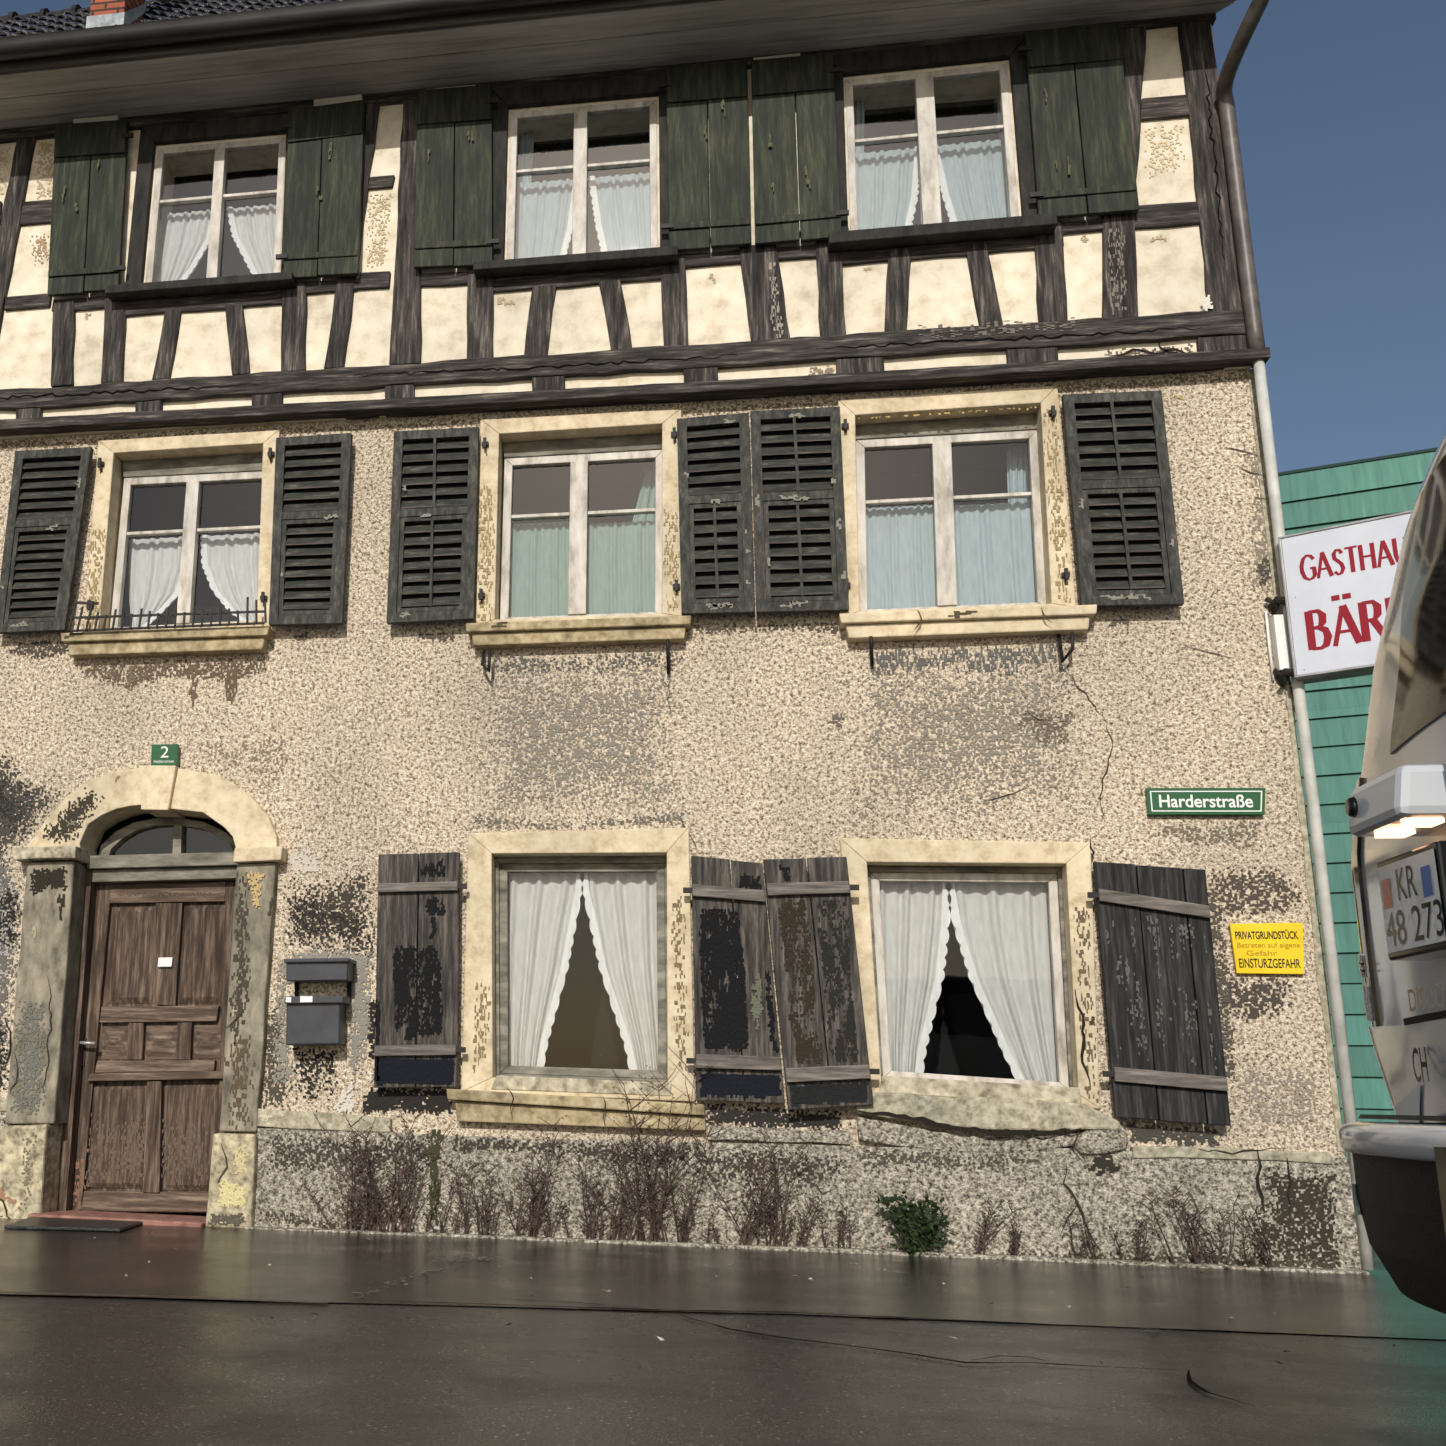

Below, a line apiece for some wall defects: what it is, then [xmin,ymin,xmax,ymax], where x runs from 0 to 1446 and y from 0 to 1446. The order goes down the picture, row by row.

water stain [9,529,269,707]
water stain [0,1024,10,1089]
water stain [0,750,105,948]
water stain [224,872,338,1130]
water stain [267,871,375,969]
water stain [367,999,375,1059]